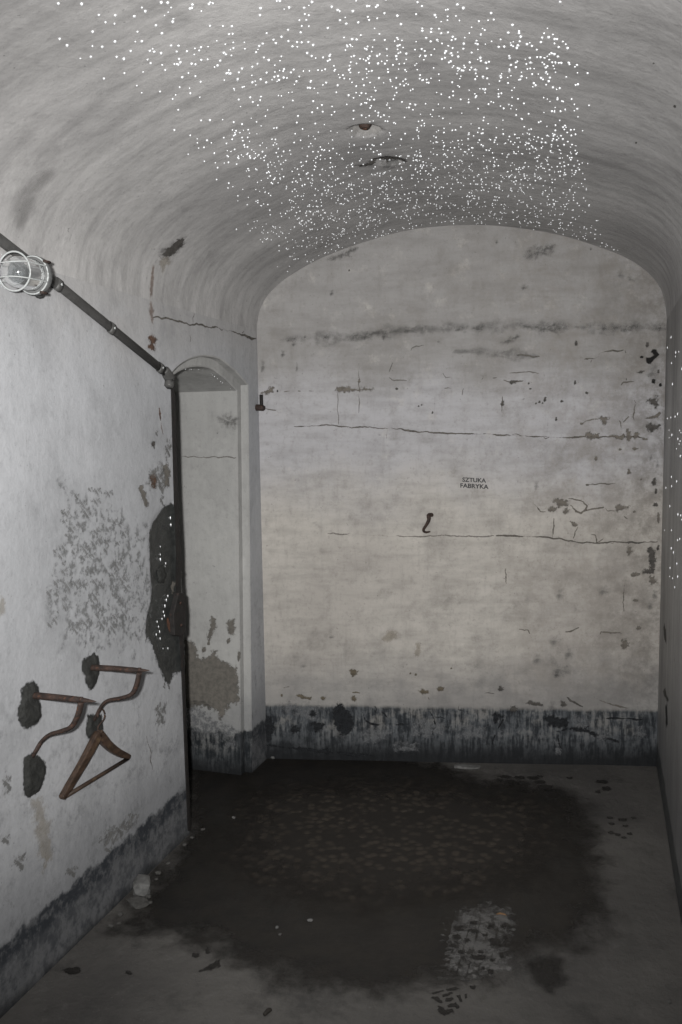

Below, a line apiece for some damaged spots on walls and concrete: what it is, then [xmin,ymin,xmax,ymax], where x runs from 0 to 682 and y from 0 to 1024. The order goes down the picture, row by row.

crack [153,313,256,341]
spalling [335,373,372,405]
crack [294,378,642,439]
crack [399,483,656,544]
peeling [139,432,240,720]
damp [114,705,608,996]